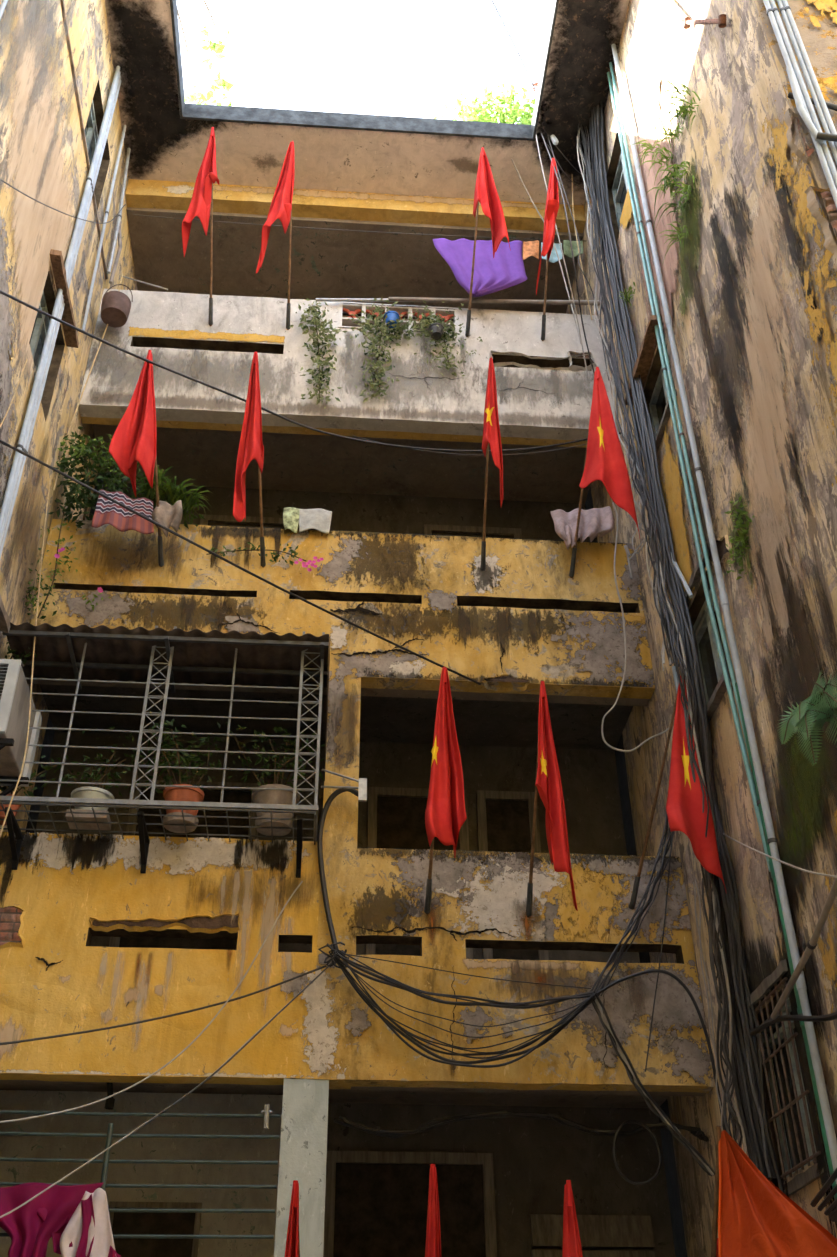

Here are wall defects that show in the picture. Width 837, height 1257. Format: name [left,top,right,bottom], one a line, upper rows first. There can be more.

peeling [795,0,837,27]
damp [762,140,823,345]
damp [0,373,10,495]
damp [680,173,778,580]
damp [772,376,809,519]
peeling [326,626,429,762]
flaking render [0,905,26,949]
peeling [14,832,313,876]
flaking render [89,913,241,934]
peeling [380,849,691,944]
peeling [0,953,372,1079]
peeling [456,959,713,1084]